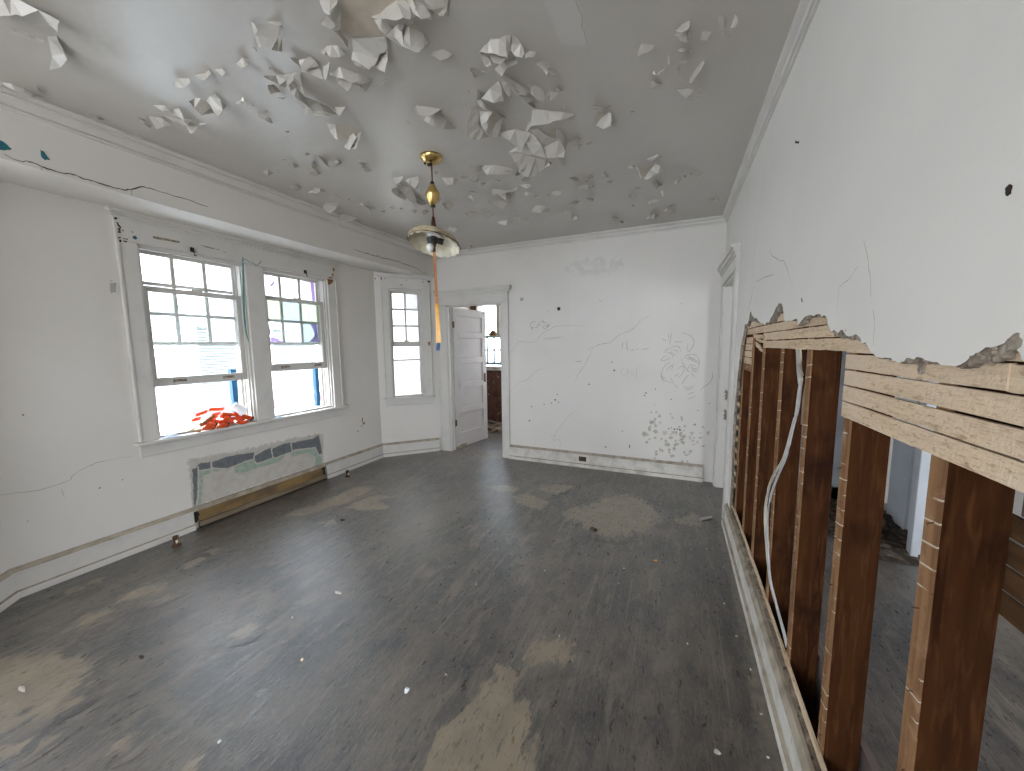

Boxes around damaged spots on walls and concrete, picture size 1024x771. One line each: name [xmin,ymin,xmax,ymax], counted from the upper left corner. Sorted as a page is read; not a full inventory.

peeling [173,69,226,88]
peeling [236,0,452,150]
peeling [650,14,738,100]
peeling [134,93,273,138]
peeling [406,35,613,225]
crack [5,154,208,207]
peeling [261,153,458,232]
peeling [628,154,675,219]
flaking render [746,304,783,327]
flaking render [833,329,861,341]
flaking render [957,333,1023,369]